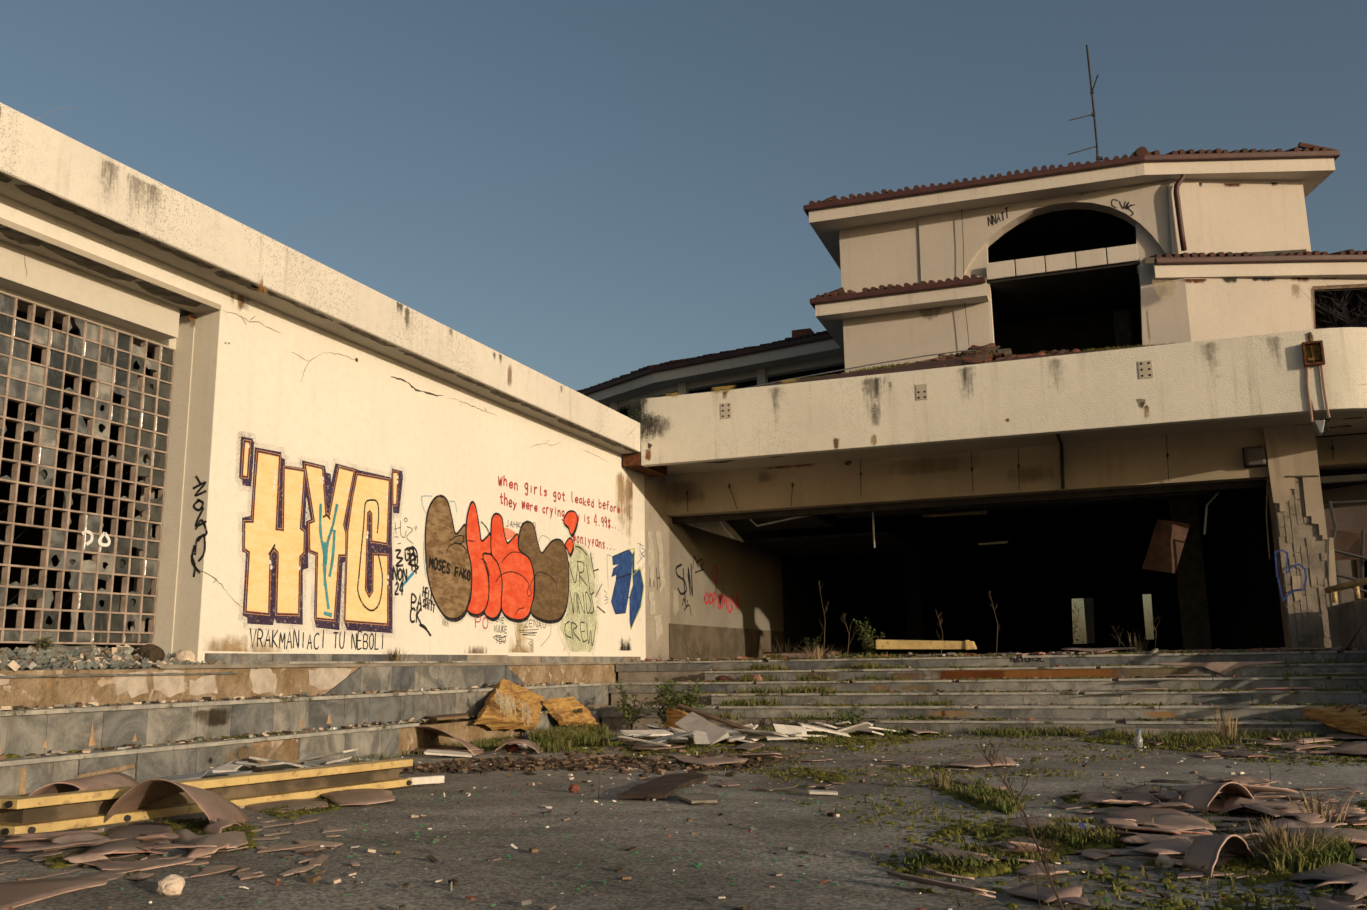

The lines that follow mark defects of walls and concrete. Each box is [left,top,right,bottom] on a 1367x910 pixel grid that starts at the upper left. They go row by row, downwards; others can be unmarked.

crack [225,311,355,383]
crack [391,376,498,416]
leakage [628,398,668,439]